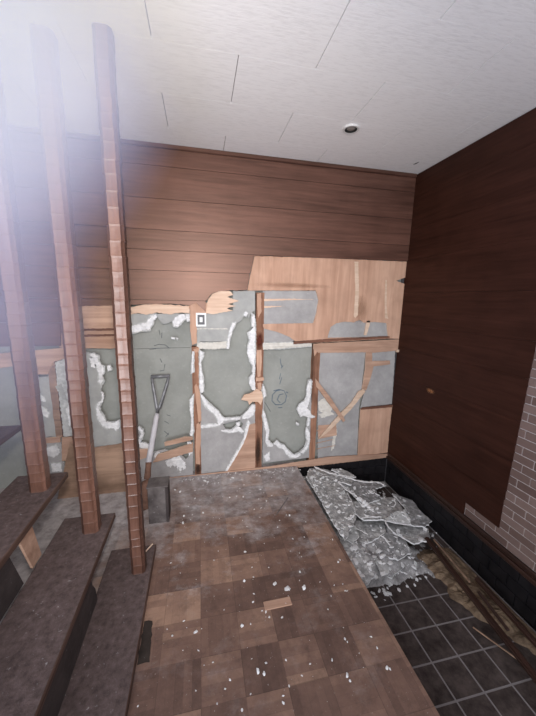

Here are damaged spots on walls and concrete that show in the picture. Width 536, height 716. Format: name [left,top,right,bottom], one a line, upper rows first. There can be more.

peeling [132,313,157,334]
peeling [38,376,51,418]
peeling [55,383,71,426]
peeling [88,352,121,431]
peeling [165,311,334,473]
peeling [47,443,62,472]
peeling [138,425,160,458]